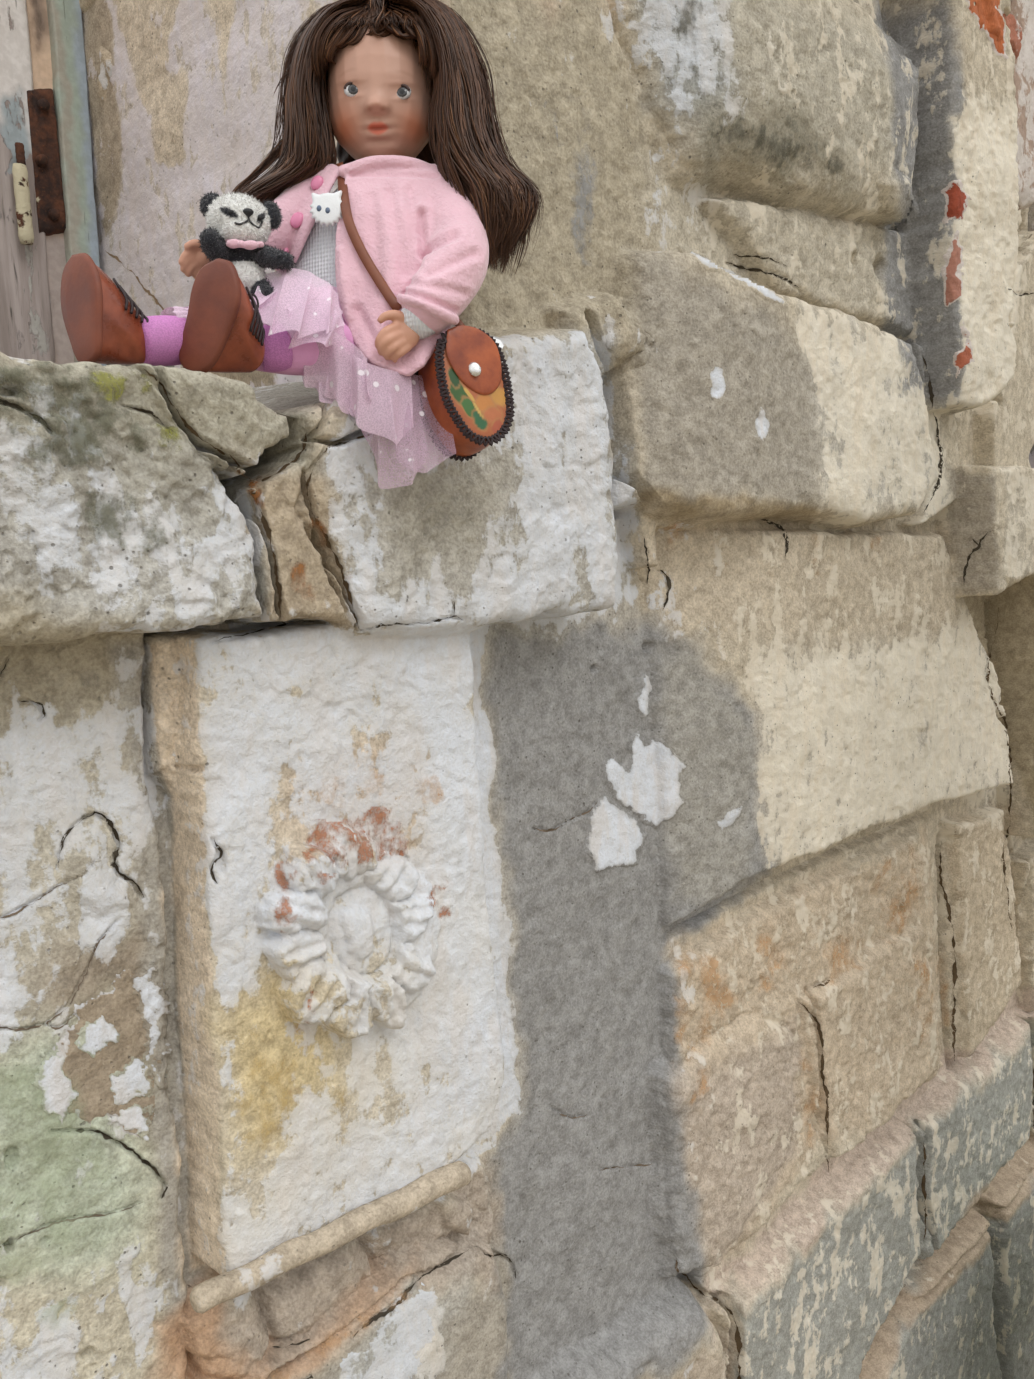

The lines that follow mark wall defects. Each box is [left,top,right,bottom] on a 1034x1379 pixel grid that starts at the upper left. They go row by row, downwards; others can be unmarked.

spalling [965,0,1009,59]
spalling [941,179,971,307]
spalling [953,321,974,379]
crack [0,399,52,431]
crack [124,368,462,642]
peeling [581,671,686,873]
crack [2,811,144,918]
crack [0,926,110,1031]
crack [938,843,958,1061]
spalling [30,959,173,1142]
crack [0,1128,168,1248]
crack [675,1260,742,1379]